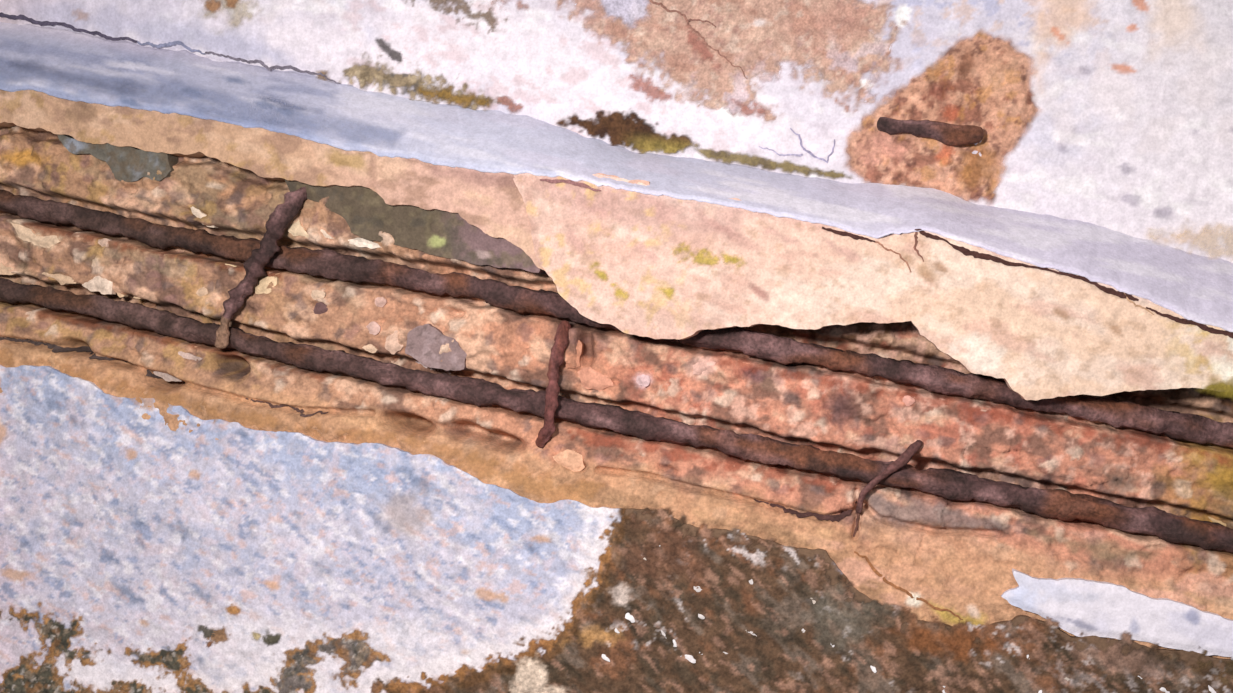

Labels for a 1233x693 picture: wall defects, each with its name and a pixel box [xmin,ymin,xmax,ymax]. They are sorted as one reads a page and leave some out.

crack [650,0,747,79]
flaking render [557,0,1038,201]
spalling [0,125,558,293]
spalling [0,211,1233,636]
water stain [0,602,228,693]
water stain [243,508,1233,693]
spalling [1104,637,1178,650]